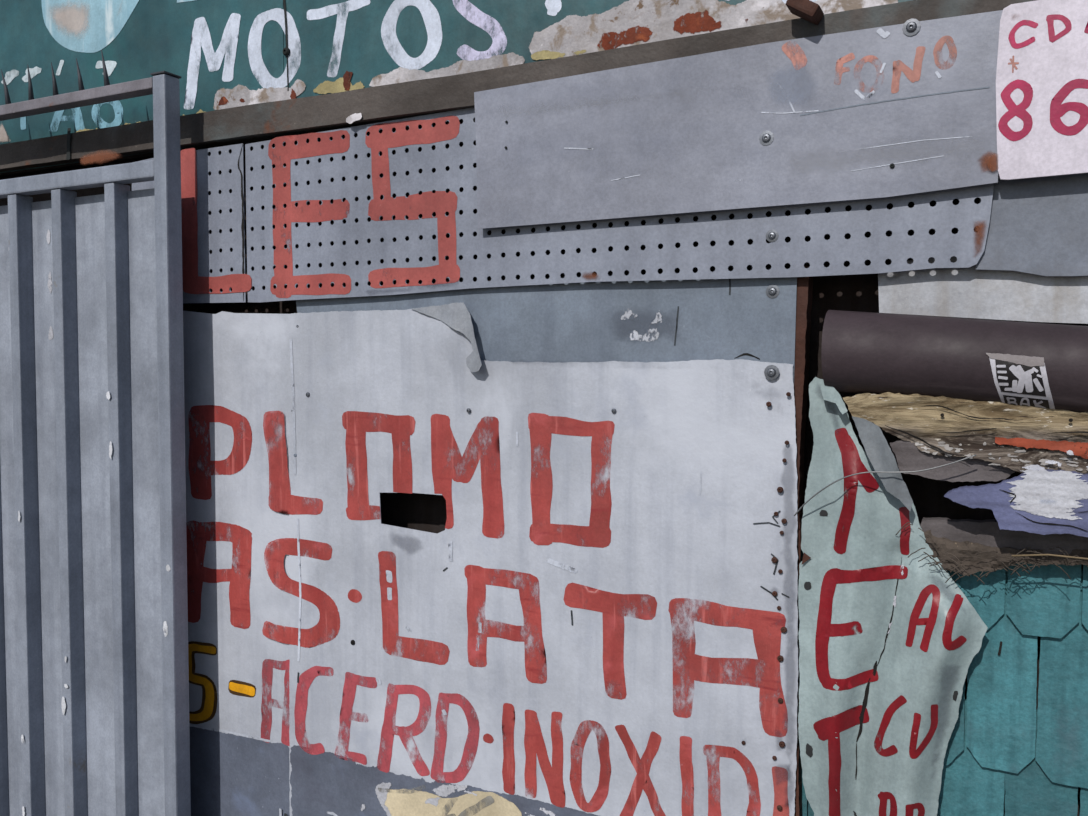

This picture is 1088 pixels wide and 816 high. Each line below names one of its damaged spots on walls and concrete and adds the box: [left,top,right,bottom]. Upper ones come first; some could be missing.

peeling [346,113,362,124]